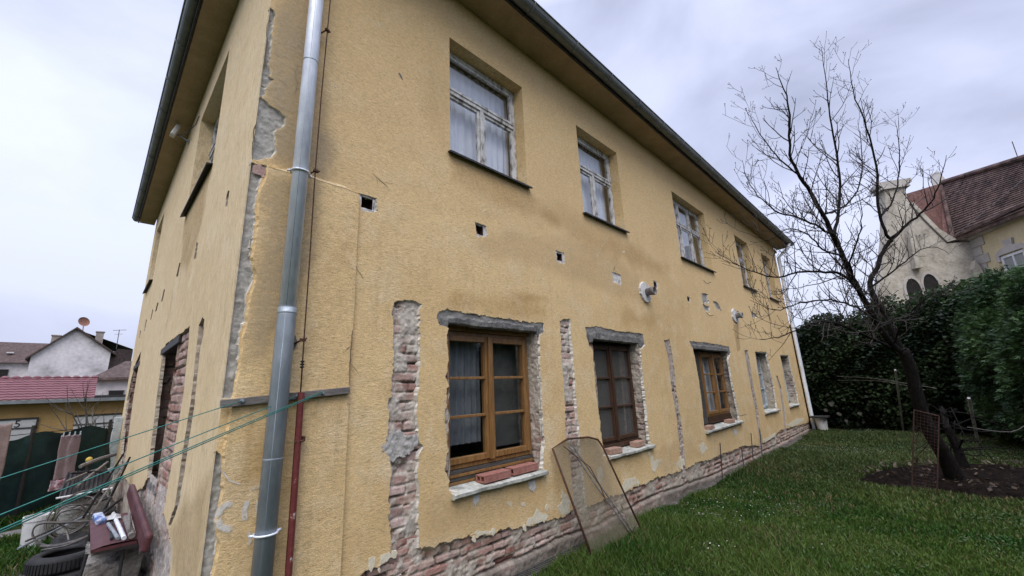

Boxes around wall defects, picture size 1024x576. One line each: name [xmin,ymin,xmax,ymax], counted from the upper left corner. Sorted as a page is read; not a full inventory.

spalling [221,8,286,400]
flaking render [111,317,204,576]
flaking render [360,299,811,576]